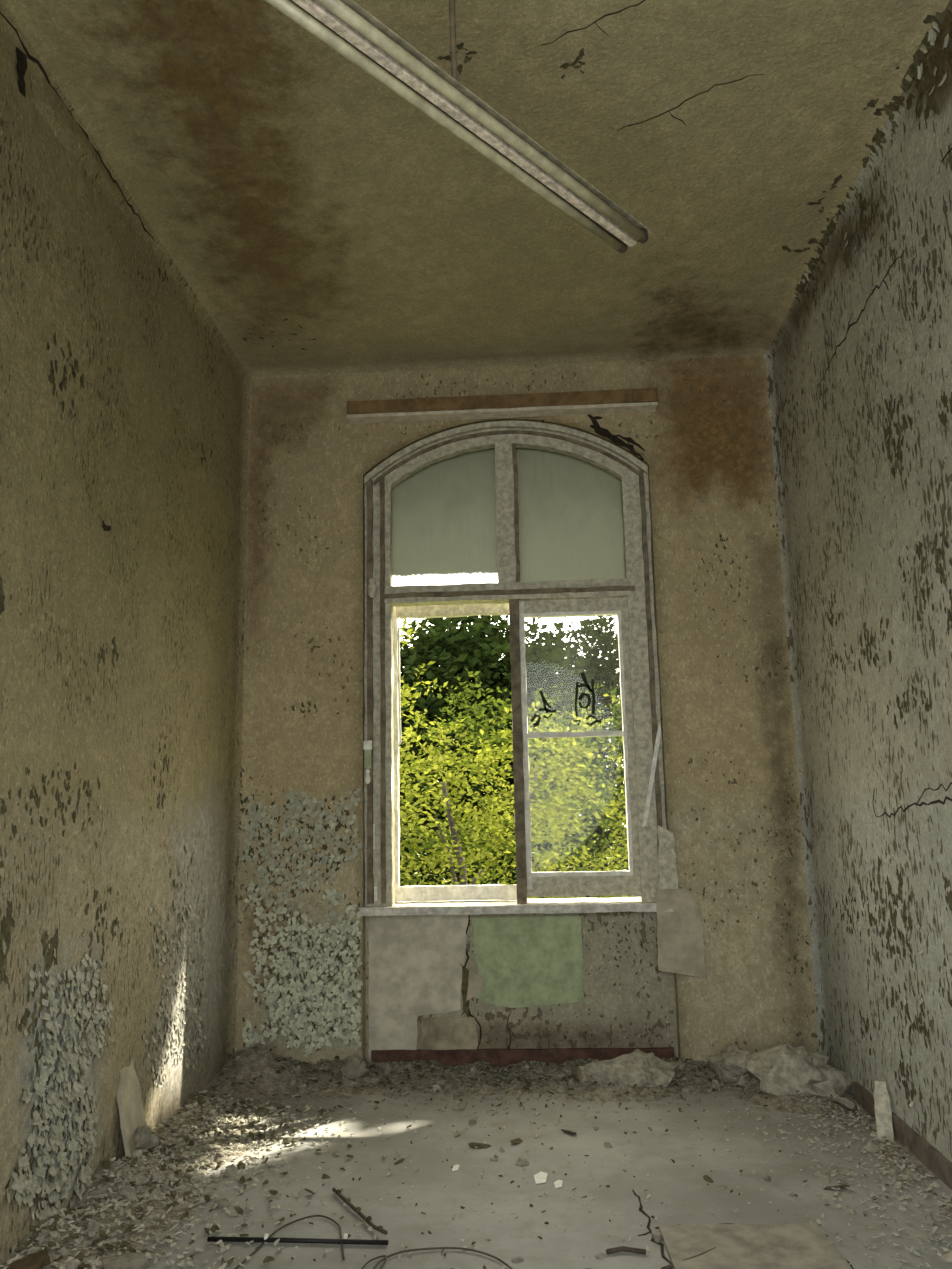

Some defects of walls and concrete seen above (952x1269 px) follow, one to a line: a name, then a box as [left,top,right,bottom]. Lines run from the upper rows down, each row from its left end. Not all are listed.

crack [541,0,645,46]
crack [617,74,764,131]
peeling [862,11,952,168]
crack [588,414,645,461]
water stain [668,361,764,490]
peeling [827,523,952,685]
crack [872,782,952,818]
peeling [5,887,123,1220]
peeling [141,846,207,1087]
peeling [239,767,478,1065]
peeling [836,855,930,1108]
crack [632,1190,672,1269]